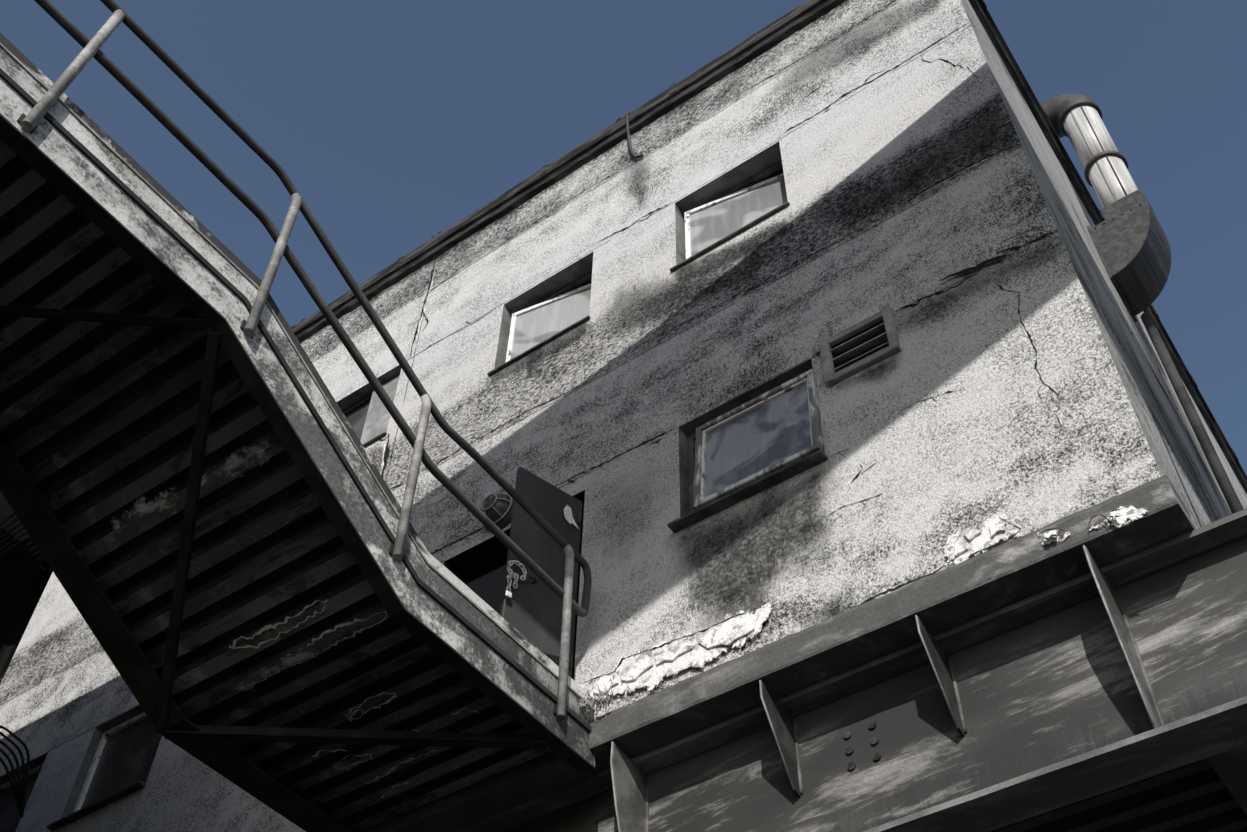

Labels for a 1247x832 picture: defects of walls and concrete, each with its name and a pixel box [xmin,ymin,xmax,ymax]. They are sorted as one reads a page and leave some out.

crack [781,24,988,138]
crack [903,146,1040,207]
damp [616,223,787,324]
crack [896,273,1062,441]
crack [1136,358,1213,496]
damp [680,472,822,617]
flaking render [943,511,1071,566]
flaking render [1088,505,1148,531]
flaking render [579,599,774,699]